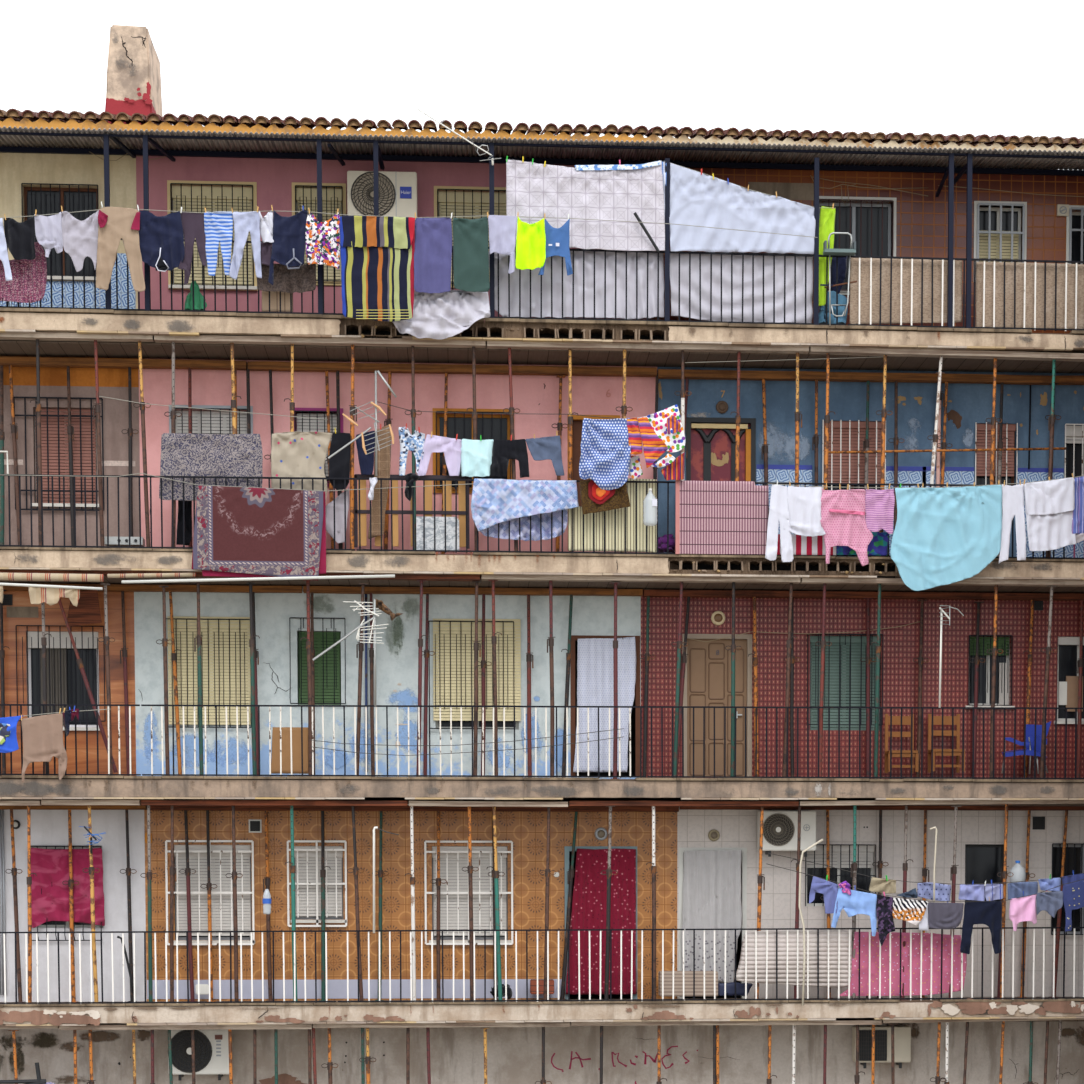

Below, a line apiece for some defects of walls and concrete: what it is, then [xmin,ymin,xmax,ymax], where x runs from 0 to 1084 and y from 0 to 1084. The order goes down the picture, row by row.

crack [121,36,146,66]
spalling [947,400,973,447]
peeling [0,1009,101,1026]
peeling [928,998,1084,1016]